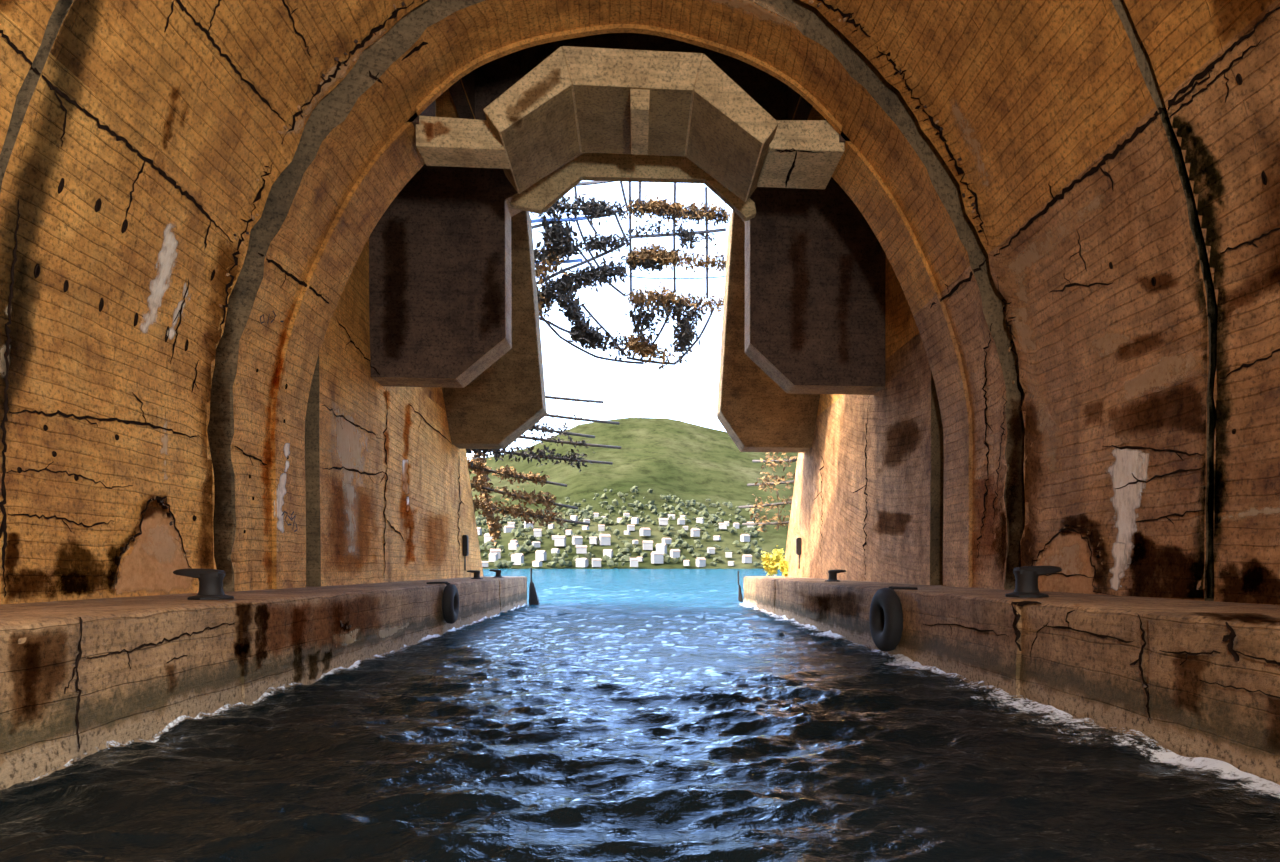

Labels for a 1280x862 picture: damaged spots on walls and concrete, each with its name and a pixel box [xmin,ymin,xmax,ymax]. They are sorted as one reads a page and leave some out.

crack [164,0,286,122]
crack [930,7,1280,309]
leakage [1186,126,1224,205]
crack [0,30,451,597]
rust [269,333,284,412]
leakage [4,533,121,603]
spalling [113,495,192,594]
rust [401,405,414,558]
leakage [1085,387,1280,624]
crack [64,617,235,749]
leakage [235,603,270,676]
crack [923,610,1280,724]